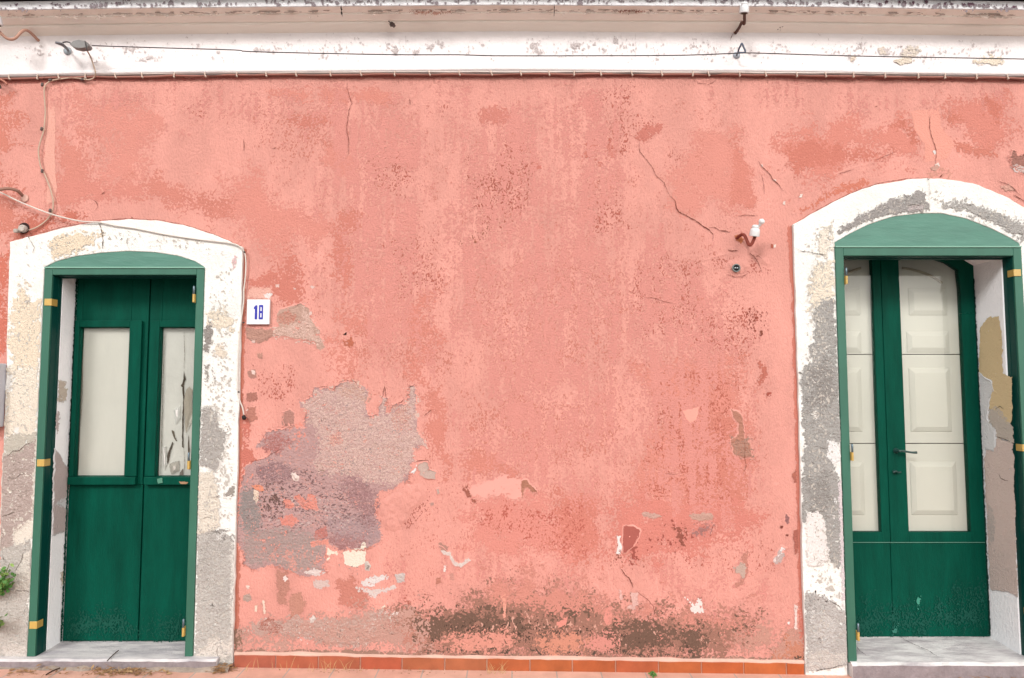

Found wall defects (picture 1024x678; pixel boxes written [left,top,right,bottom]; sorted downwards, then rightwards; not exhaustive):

peeling [878,45,921,65]
crack [639,145,762,277]
spalling [837,190,929,234]
spalling [942,197,1024,243]
peeling [193,82,843,664]
peeling [978,316,1018,597]
spalling [0,426,36,657]
peeling [787,590,848,673]